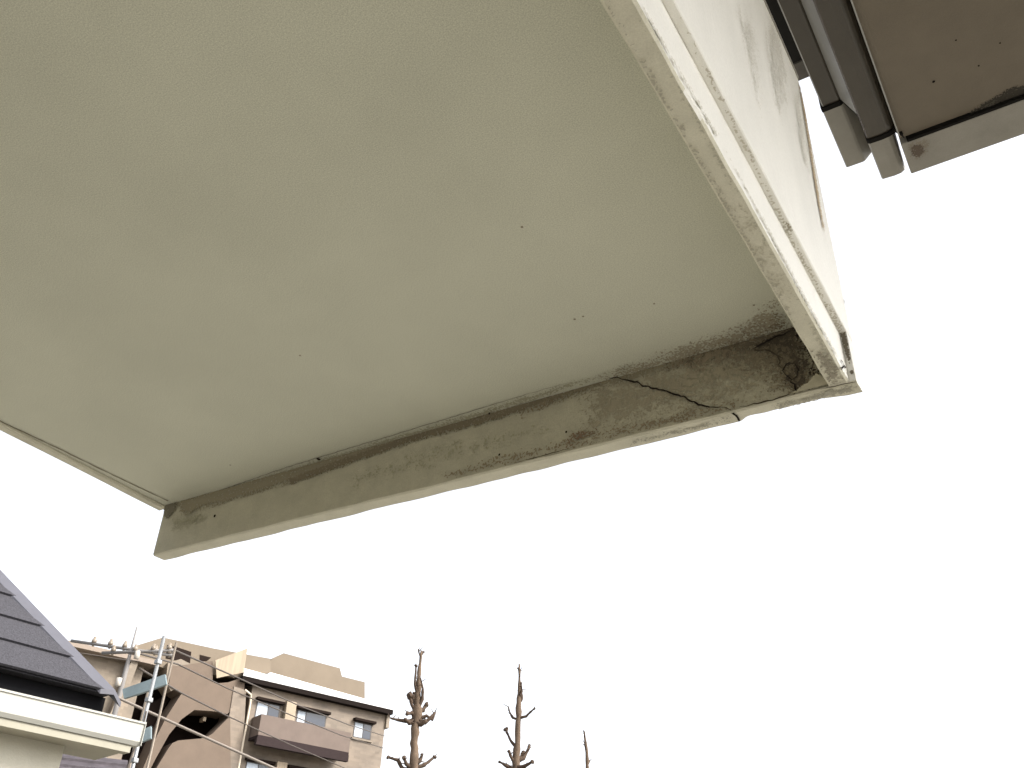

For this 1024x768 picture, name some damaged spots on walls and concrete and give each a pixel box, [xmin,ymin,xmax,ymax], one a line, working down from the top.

damp [736,5,812,177]
damp [176,205,857,516]
crack [609,329,799,421]